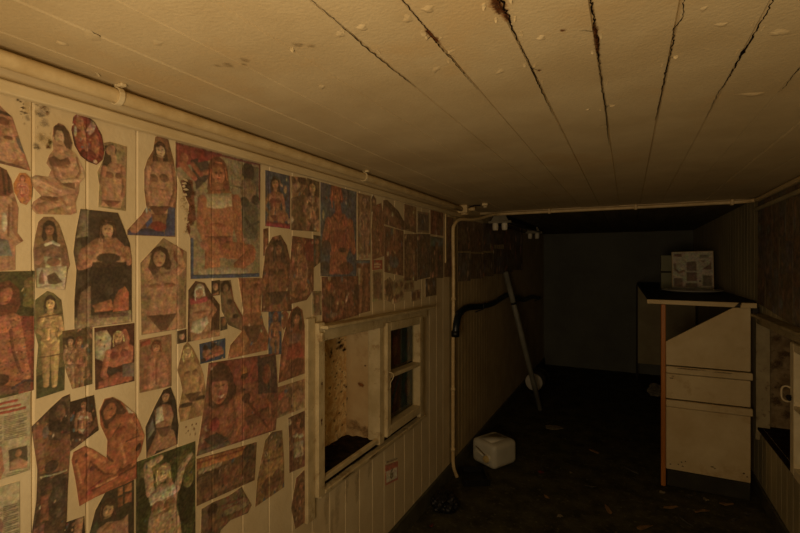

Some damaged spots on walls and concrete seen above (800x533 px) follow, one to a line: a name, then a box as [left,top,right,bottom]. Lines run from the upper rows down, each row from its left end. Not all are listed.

crack [313,1,410,83]
crack [402,0,475,87]
crack [497,0,551,111]
crack [590,0,614,141]
crack [655,0,685,121]
crack [708,0,774,113]